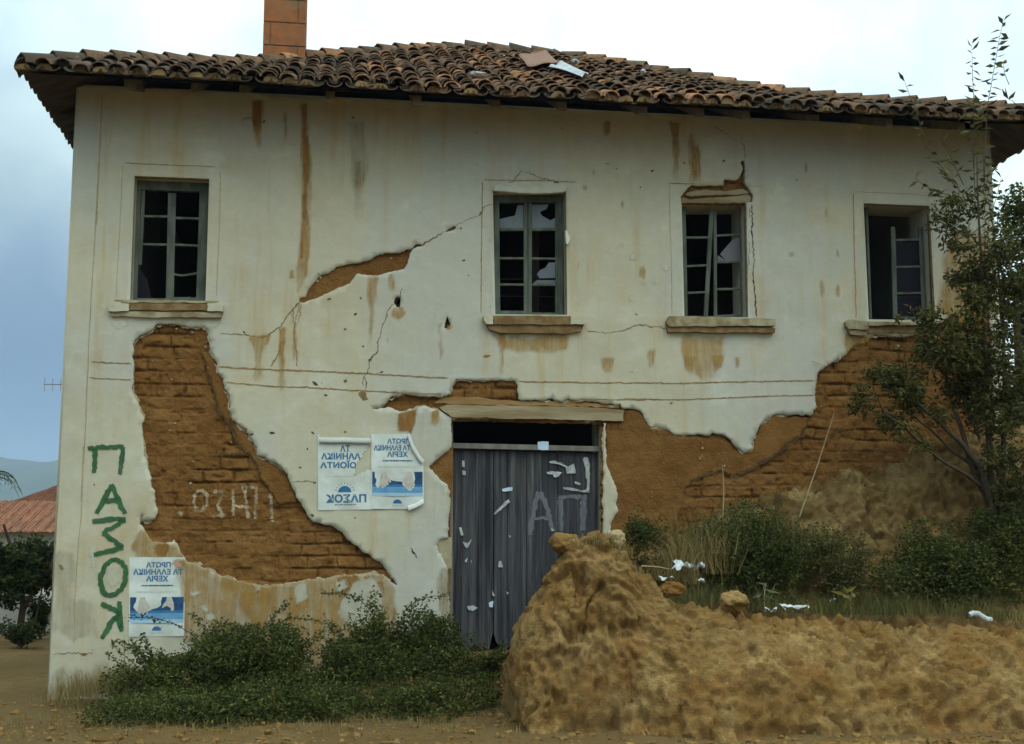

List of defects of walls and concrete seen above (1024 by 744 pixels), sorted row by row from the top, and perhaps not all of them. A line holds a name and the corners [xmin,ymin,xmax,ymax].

flaking render [299,245,421,303]
crack [422,204,493,245]
flaking render [681,162,752,206]
crack [747,206,757,317]
crack [362,292,401,389]
flaking render [133,324,396,594]
flaking render [358,311,993,574]